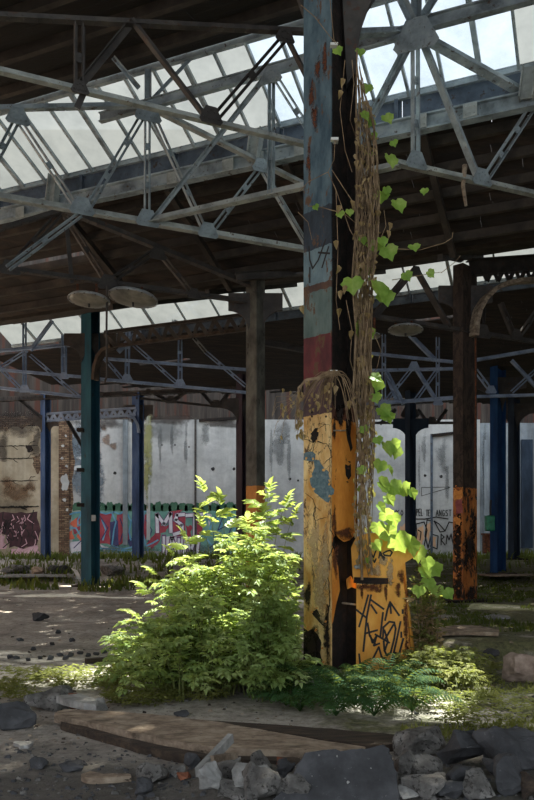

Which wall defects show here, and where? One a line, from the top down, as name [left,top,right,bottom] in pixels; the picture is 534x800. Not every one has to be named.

rust [309,42,327,128]
damp [3,479,35,500]
peeling [304,428,334,504]
peeling [303,522,329,667]
rust [453,513,476,599]